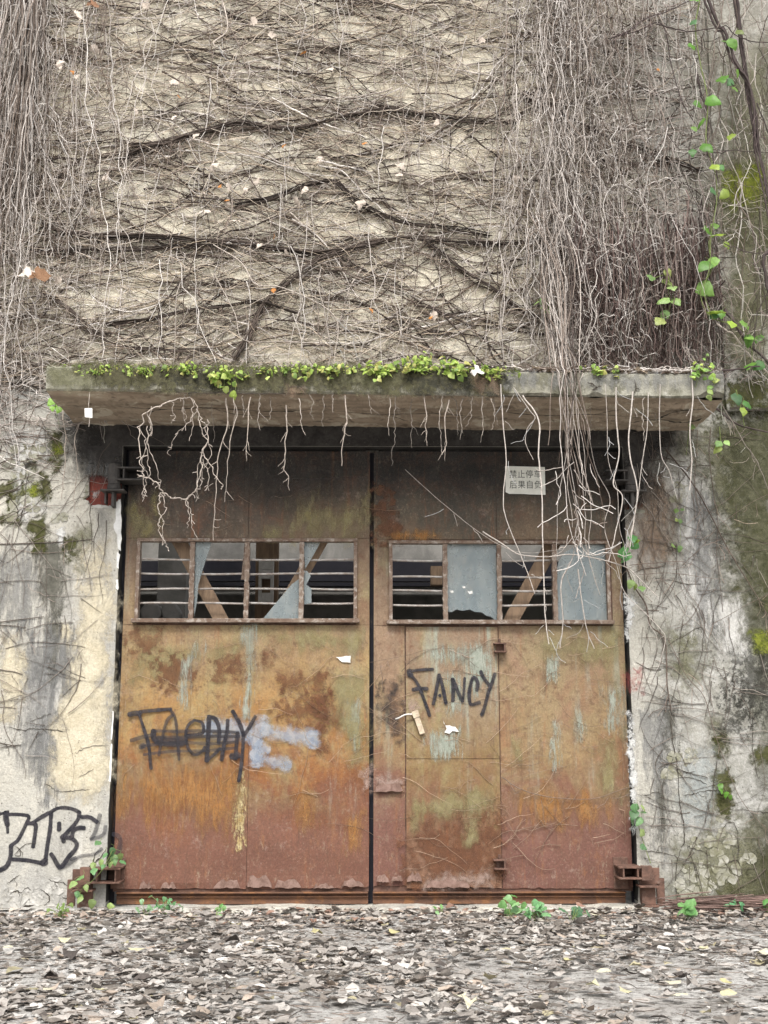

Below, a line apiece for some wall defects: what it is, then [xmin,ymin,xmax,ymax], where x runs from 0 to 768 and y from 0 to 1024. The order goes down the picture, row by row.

water stain [672,472,744,655]
rust [122,626,197,695]
rust [208,650,346,756]
peeling [139,881,178,891]
rust [119,762,247,852]
peeling [213,875,364,890]
peeling [376,782,403,792]
peeling [376,871,469,888]
rust [397,800,507,895]
water stain [658,789,666,851]
water stain [660,709,713,827]
crack [638,708,768,898]